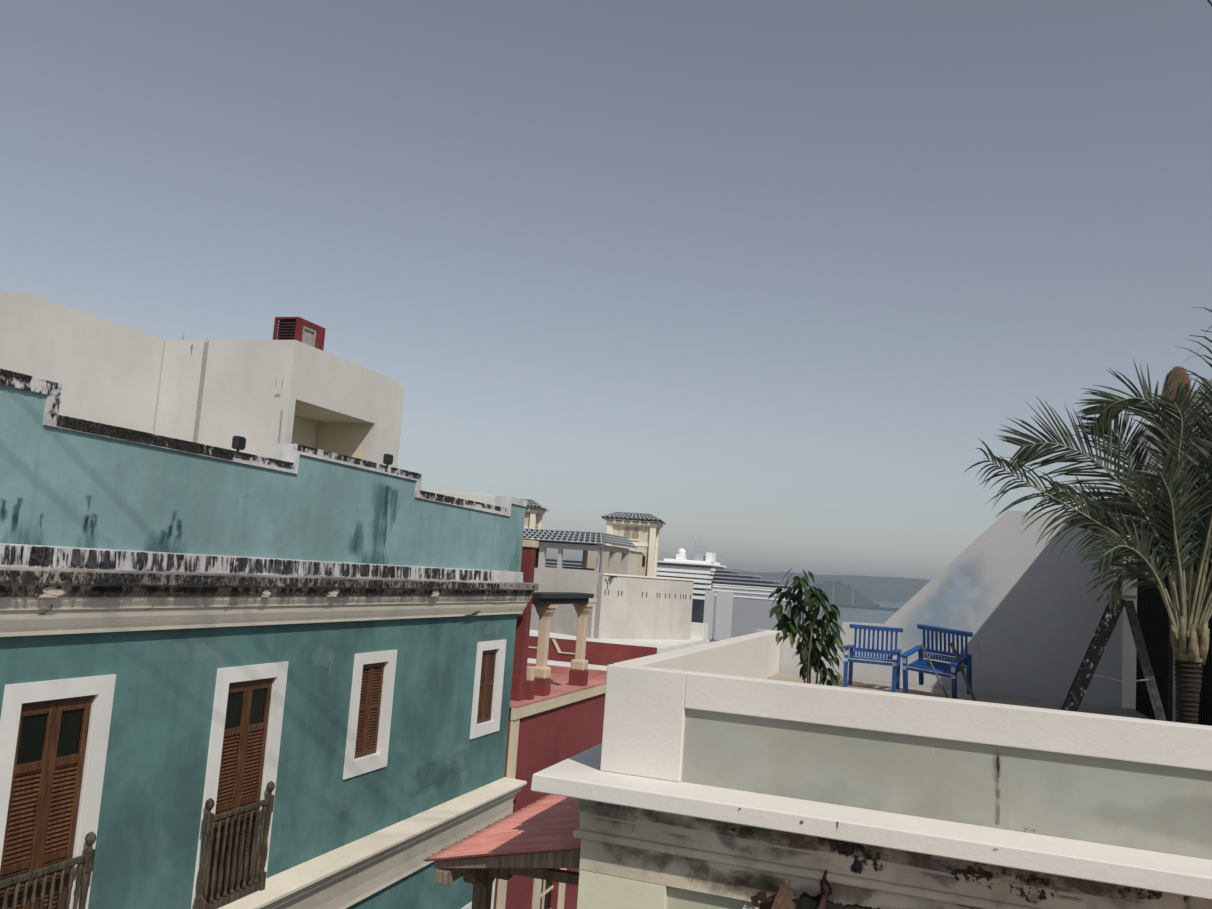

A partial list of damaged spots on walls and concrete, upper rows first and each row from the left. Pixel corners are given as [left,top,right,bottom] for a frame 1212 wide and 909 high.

peeling [39,586,64,597]